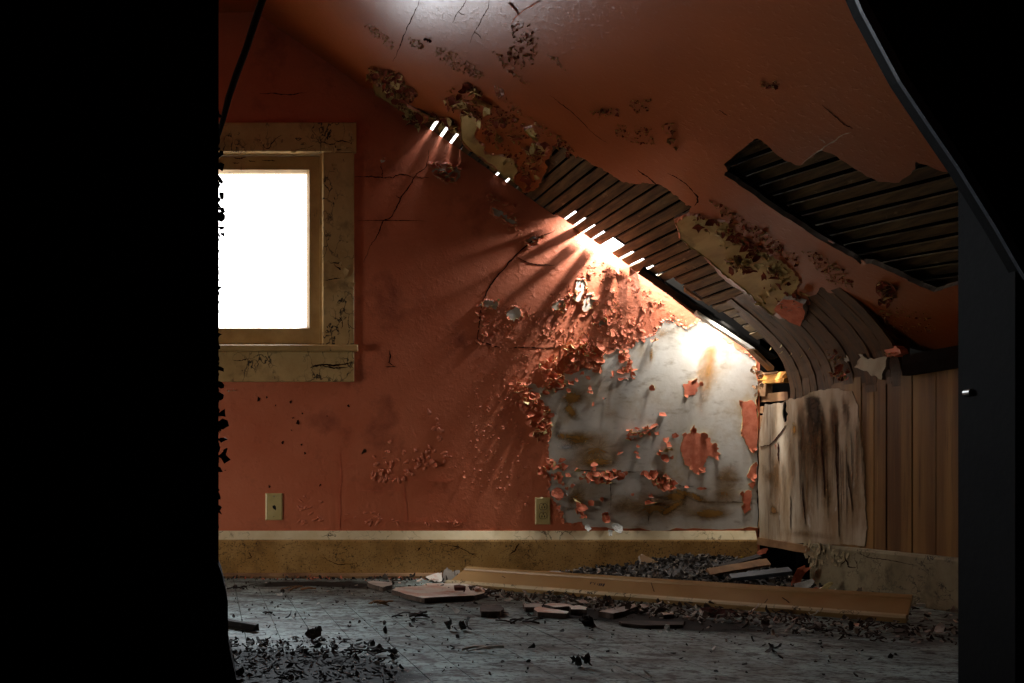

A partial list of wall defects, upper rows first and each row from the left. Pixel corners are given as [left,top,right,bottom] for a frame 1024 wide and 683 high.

crack [327,151,429,281]
peeling [365,37,854,536]
flaking render [725,139,958,309]
water stain [621,469,737,519]
water stain [758,388,868,546]